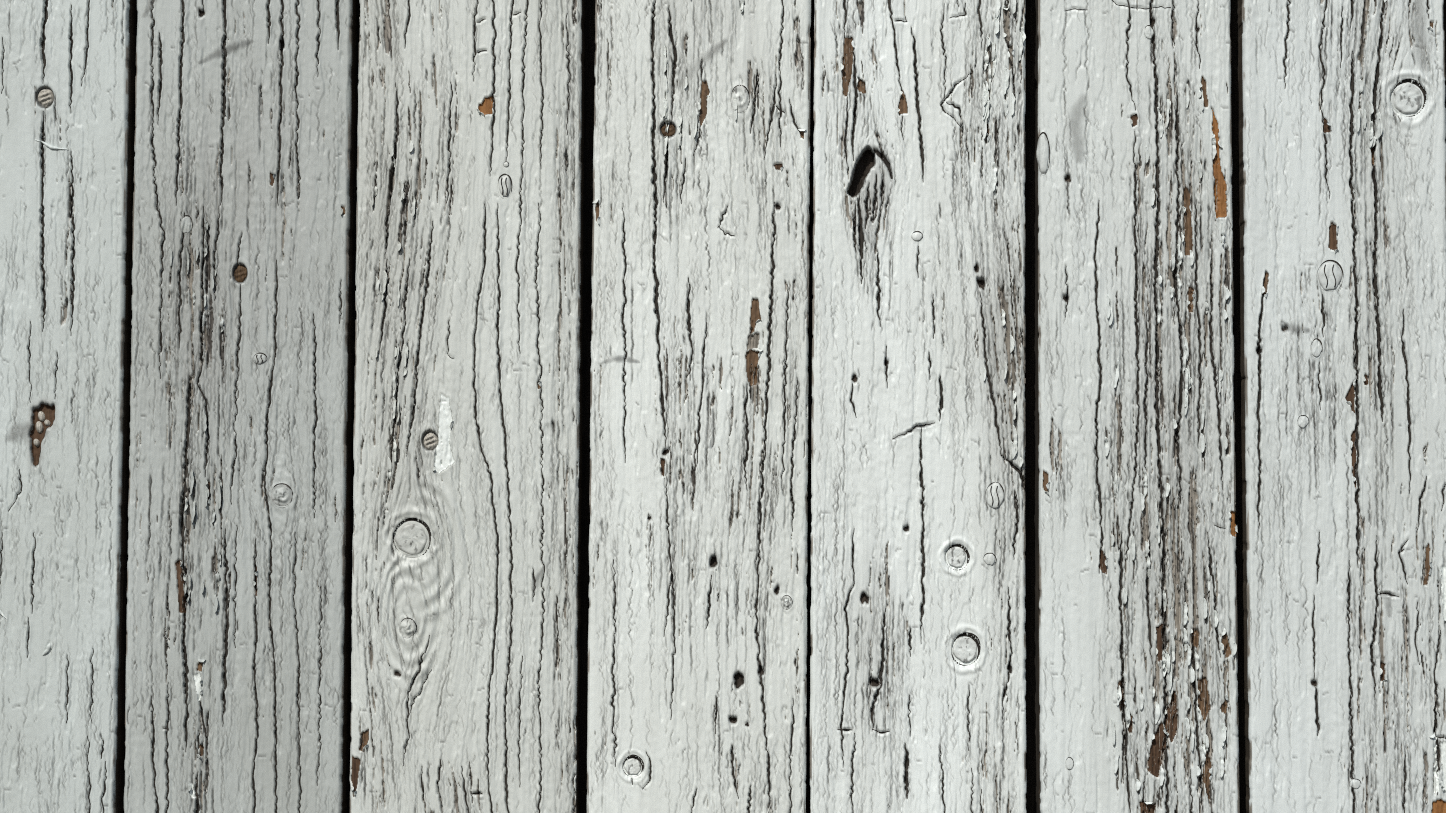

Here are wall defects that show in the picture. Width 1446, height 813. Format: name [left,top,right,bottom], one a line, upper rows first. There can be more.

peeling [476,96,493,117]
peeling [841,37,866,96]
peeling [897,90,907,114]
crack [888,0,1016,178]
crack [843,0,888,416]
peeling [745,298,763,386]
peeling [33,411,51,447]
peeling [1099,77,1240,813]
crack [837,246,1025,813]